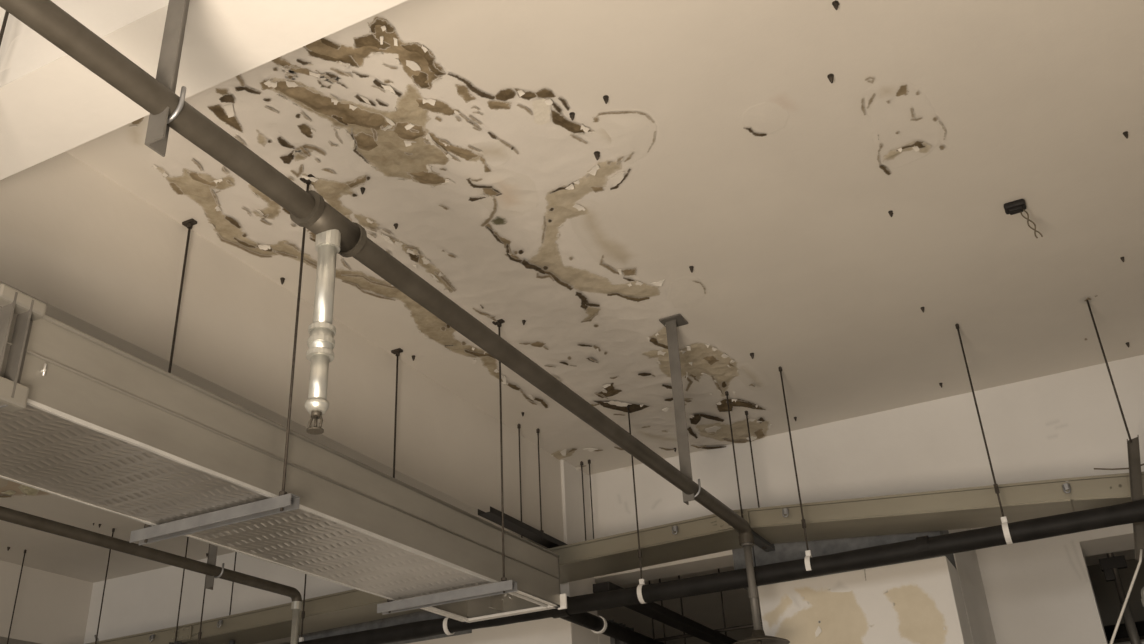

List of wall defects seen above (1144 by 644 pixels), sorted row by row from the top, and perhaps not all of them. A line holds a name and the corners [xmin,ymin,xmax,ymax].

peeling [861,75,946,175]
peeling [90,114,318,291]
peeling [185,1,801,471]
damp [0,478,57,498]
peeling [753,530,949,566]
peeling [760,554,957,644]